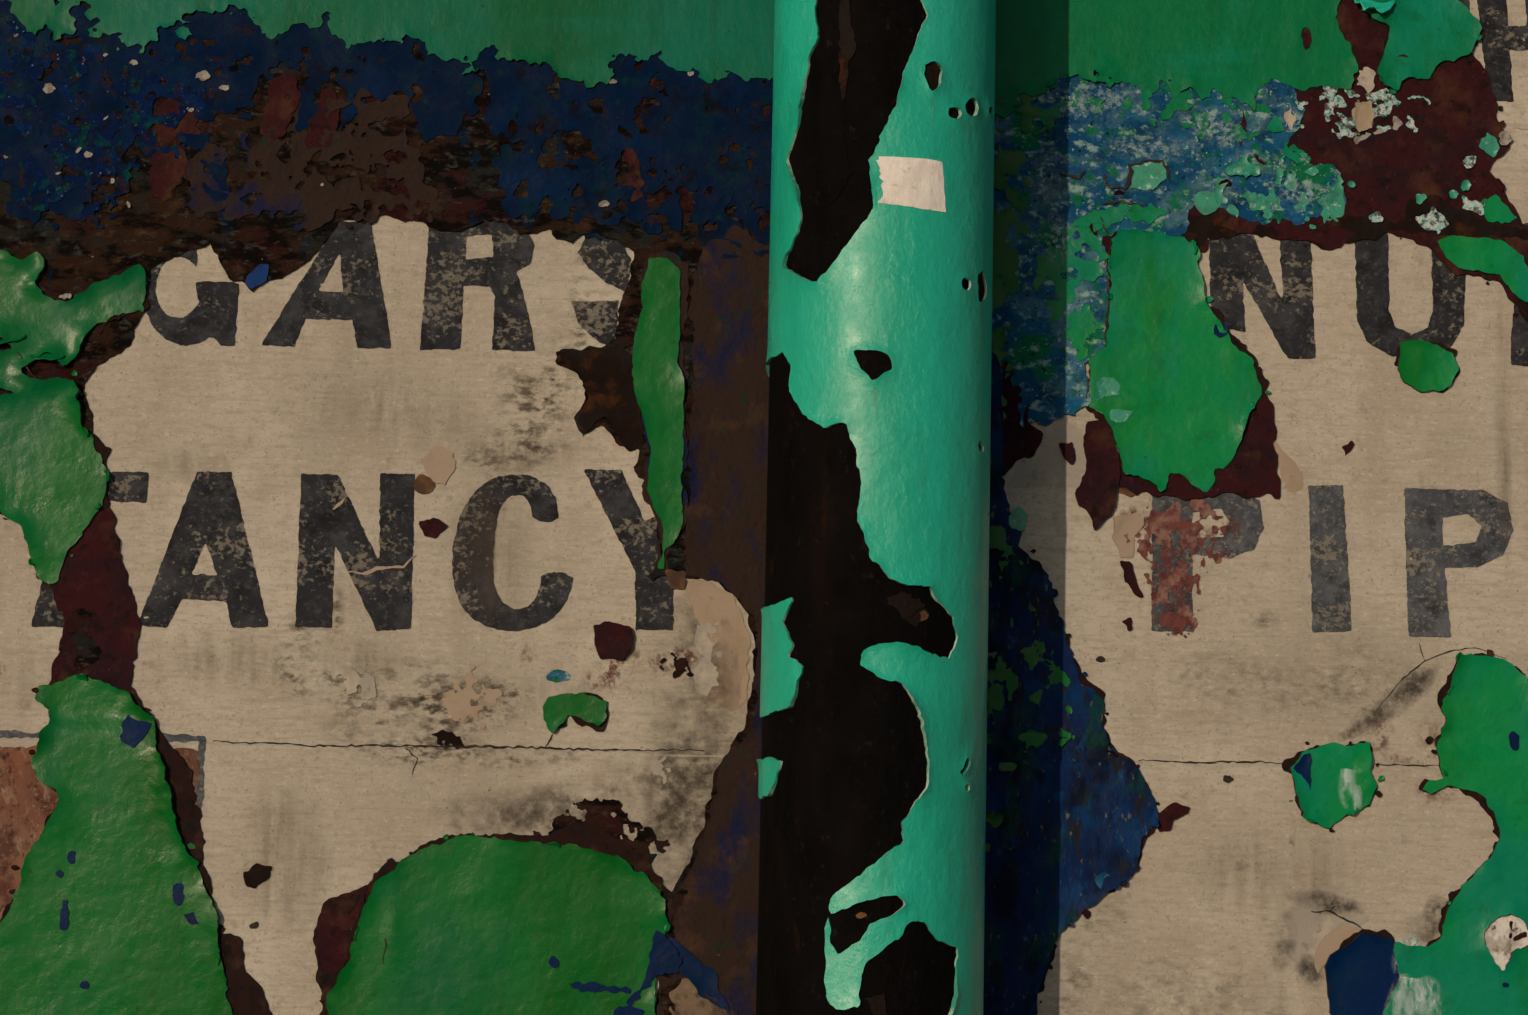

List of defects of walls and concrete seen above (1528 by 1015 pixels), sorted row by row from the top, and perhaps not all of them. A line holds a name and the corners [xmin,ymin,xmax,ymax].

peeling [0,0,956,1015]
peeling [949,98,975,119]
peeling [962,0,1528,1015]